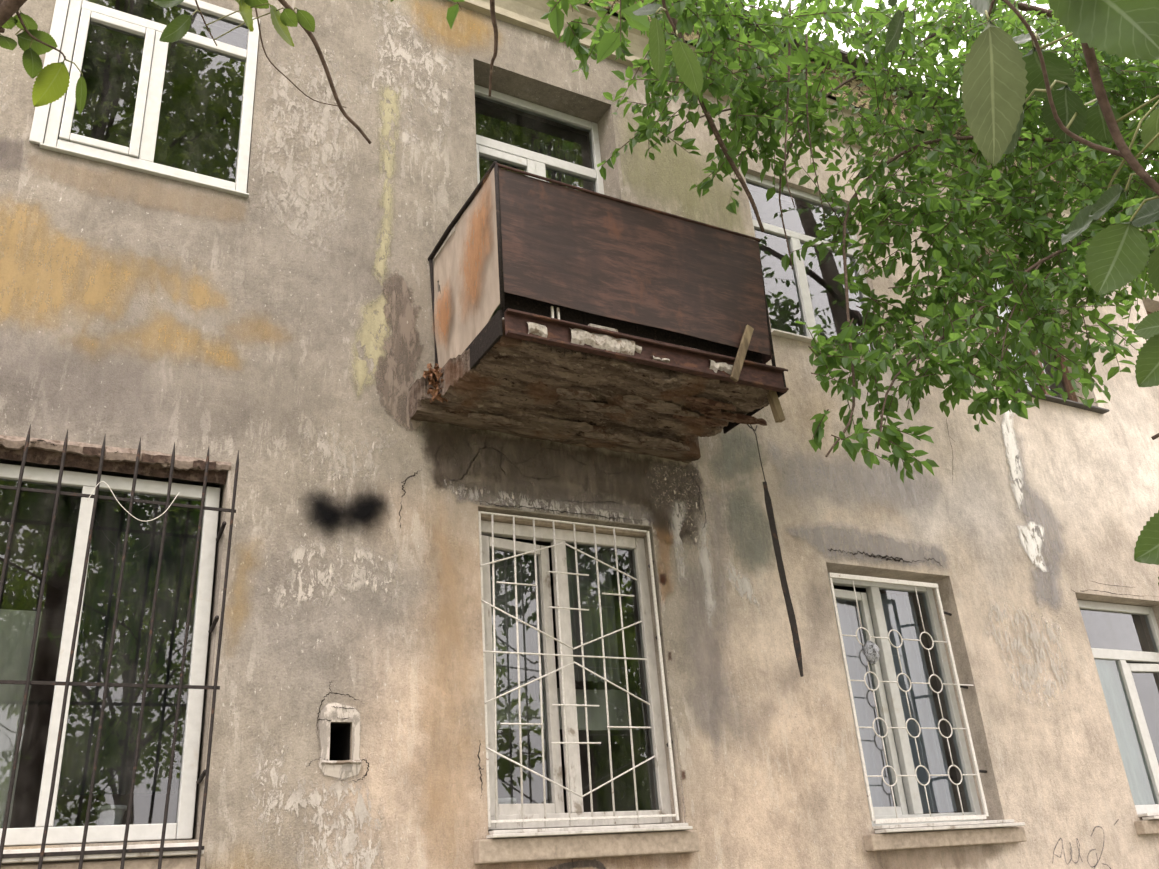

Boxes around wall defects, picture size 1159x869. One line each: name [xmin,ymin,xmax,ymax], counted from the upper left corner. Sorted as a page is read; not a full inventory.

leakage [0,207,132,318]
corrosion [463,191,489,305]
corrosion [436,288,450,338]
crack [399,436,643,528]
peeling [444,480,657,534]
leakage [423,422,714,617]
flaking render [538,388,767,544]
crack [827,548,943,567]
peeling [1002,400,1023,508]
peeling [1018,522,1047,572]
crack [306,682,369,782]